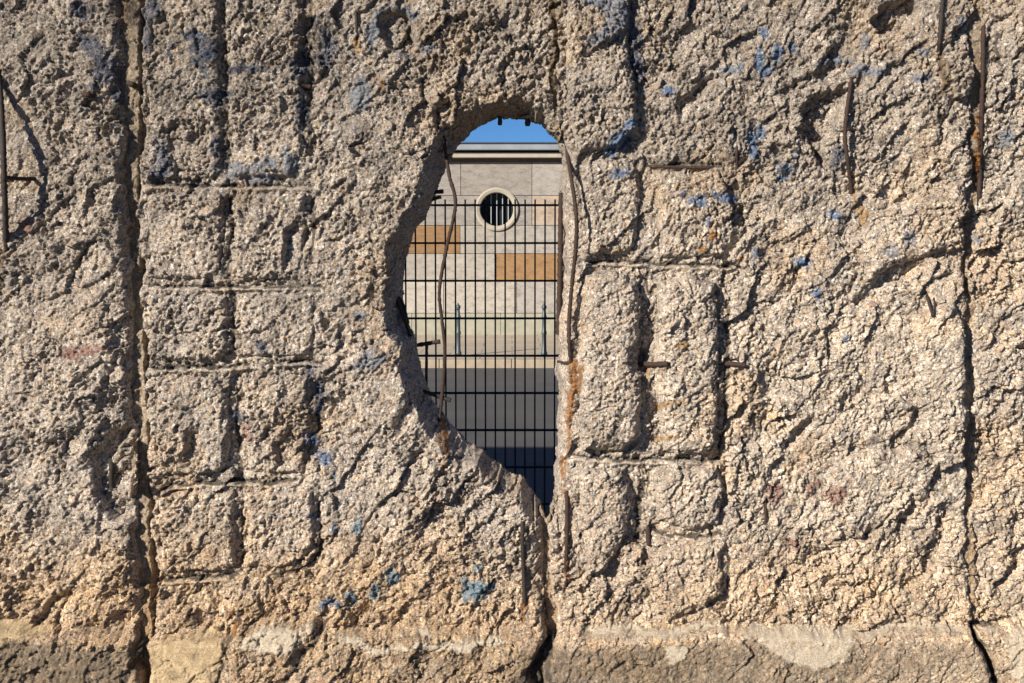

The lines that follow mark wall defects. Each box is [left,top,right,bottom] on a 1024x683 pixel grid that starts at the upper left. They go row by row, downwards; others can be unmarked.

spalling [433,96,457,139]
crack [134,0,328,582]
corrosion [559,360,583,493]
crack [123,636,149,683]
crack [970,617,1008,683]